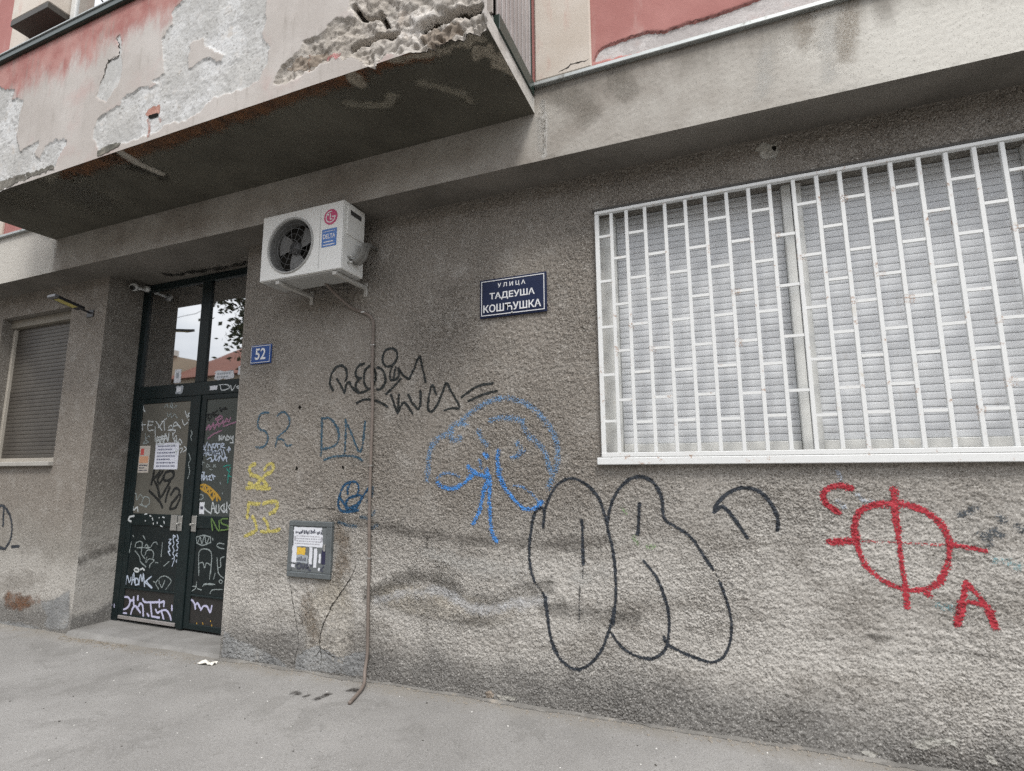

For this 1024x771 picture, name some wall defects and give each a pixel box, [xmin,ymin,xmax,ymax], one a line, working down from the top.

flaking render [0,87,67,192]
flaking render [93,0,515,180]
crack [290,565,356,668]